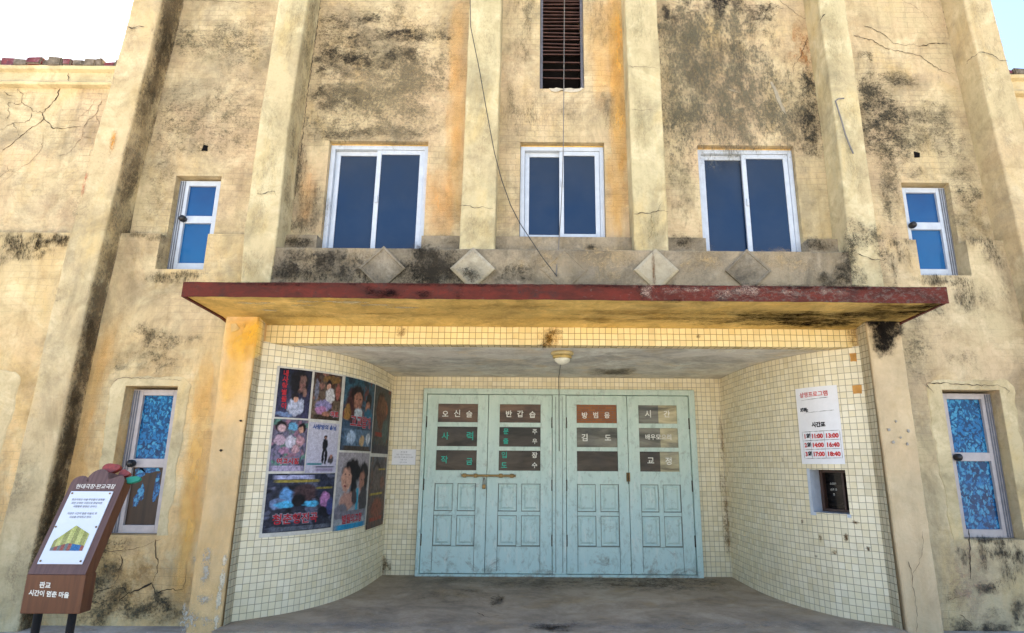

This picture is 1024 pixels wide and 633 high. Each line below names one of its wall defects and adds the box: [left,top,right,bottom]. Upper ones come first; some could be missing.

water stain [302,3,452,137]
water stain [658,0,822,158]
crack [854,3,1007,74]
crack [0,73,102,182]
water stain [859,73,932,220]
water stain [701,303,944,354]
water stain [788,220,911,289]
water stain [922,274,974,308]
water stain [79,542,183,625]
crack [97,540,187,602]